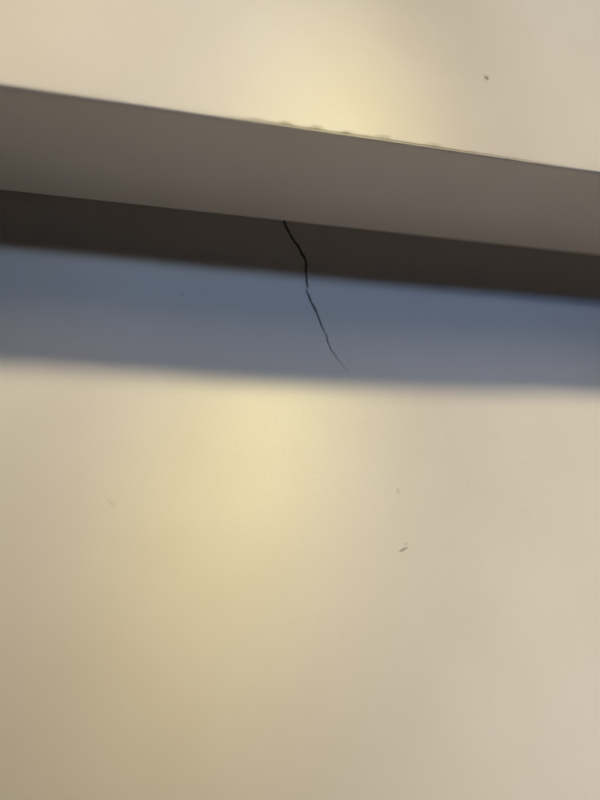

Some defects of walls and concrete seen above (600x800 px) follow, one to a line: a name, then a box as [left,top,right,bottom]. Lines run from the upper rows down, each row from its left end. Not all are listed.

crack [283,220,323,329]